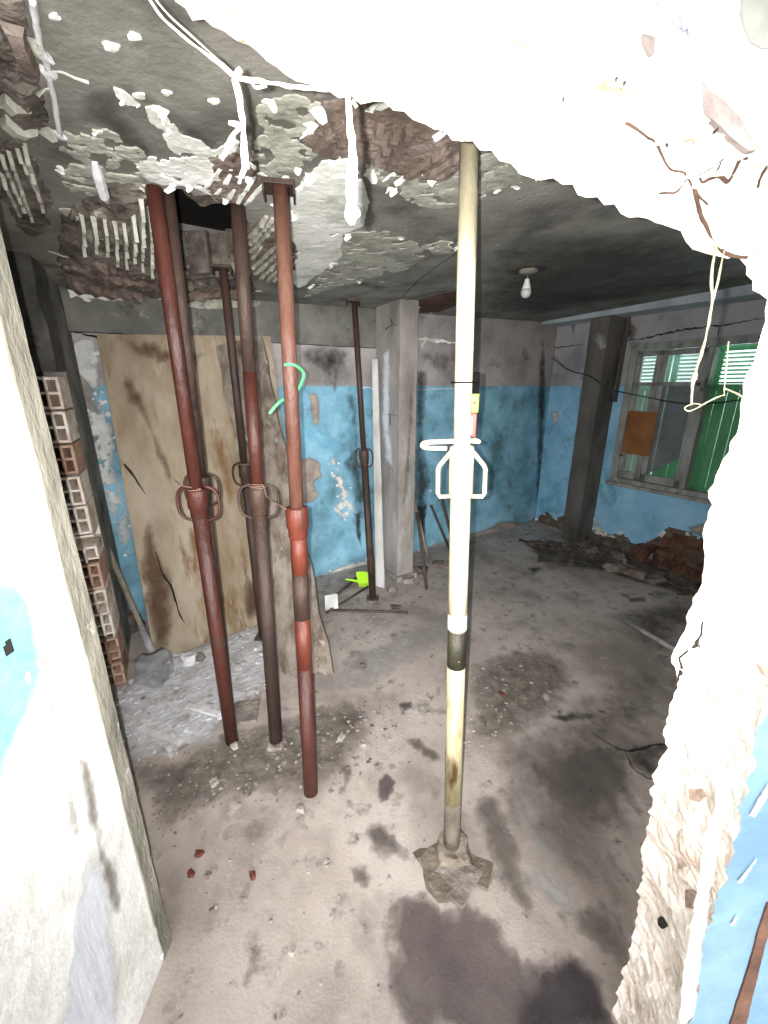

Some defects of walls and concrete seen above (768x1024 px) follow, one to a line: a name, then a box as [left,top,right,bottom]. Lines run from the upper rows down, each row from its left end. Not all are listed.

spalling [0,0,460,298]
peeling [478,152,538,205]
water stain [314,353,341,378]
peeling [309,394,320,424]
peeling [74,339,131,556]
peeling [302,457,354,522]
flaking render [590,518,705,574]
crack [592,733,666,780]
water stain [393,899,608,1024]